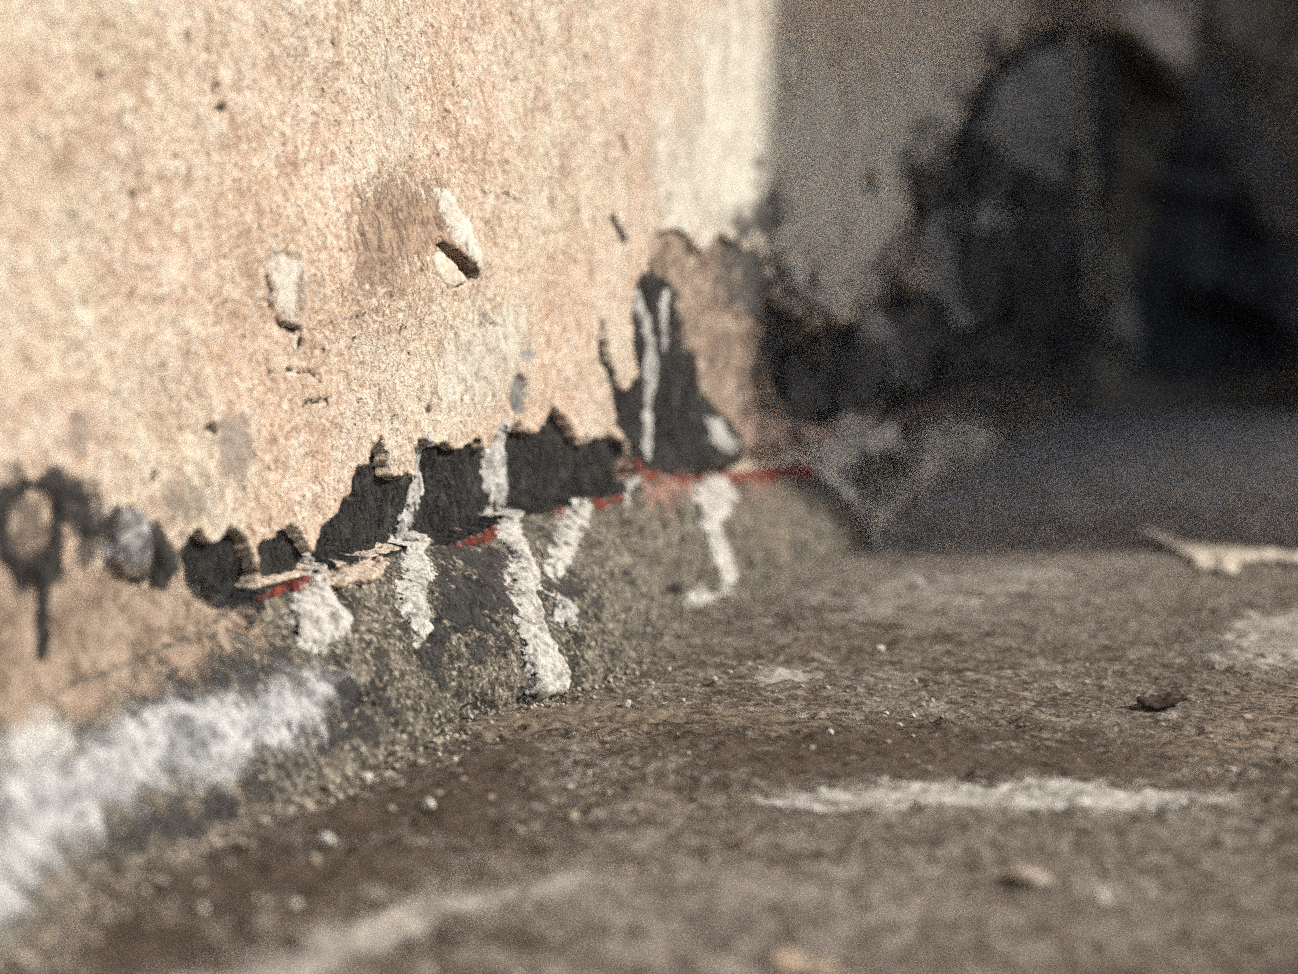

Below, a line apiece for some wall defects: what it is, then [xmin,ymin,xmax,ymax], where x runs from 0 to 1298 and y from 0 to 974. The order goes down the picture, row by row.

spalling [0,0,1195,727]